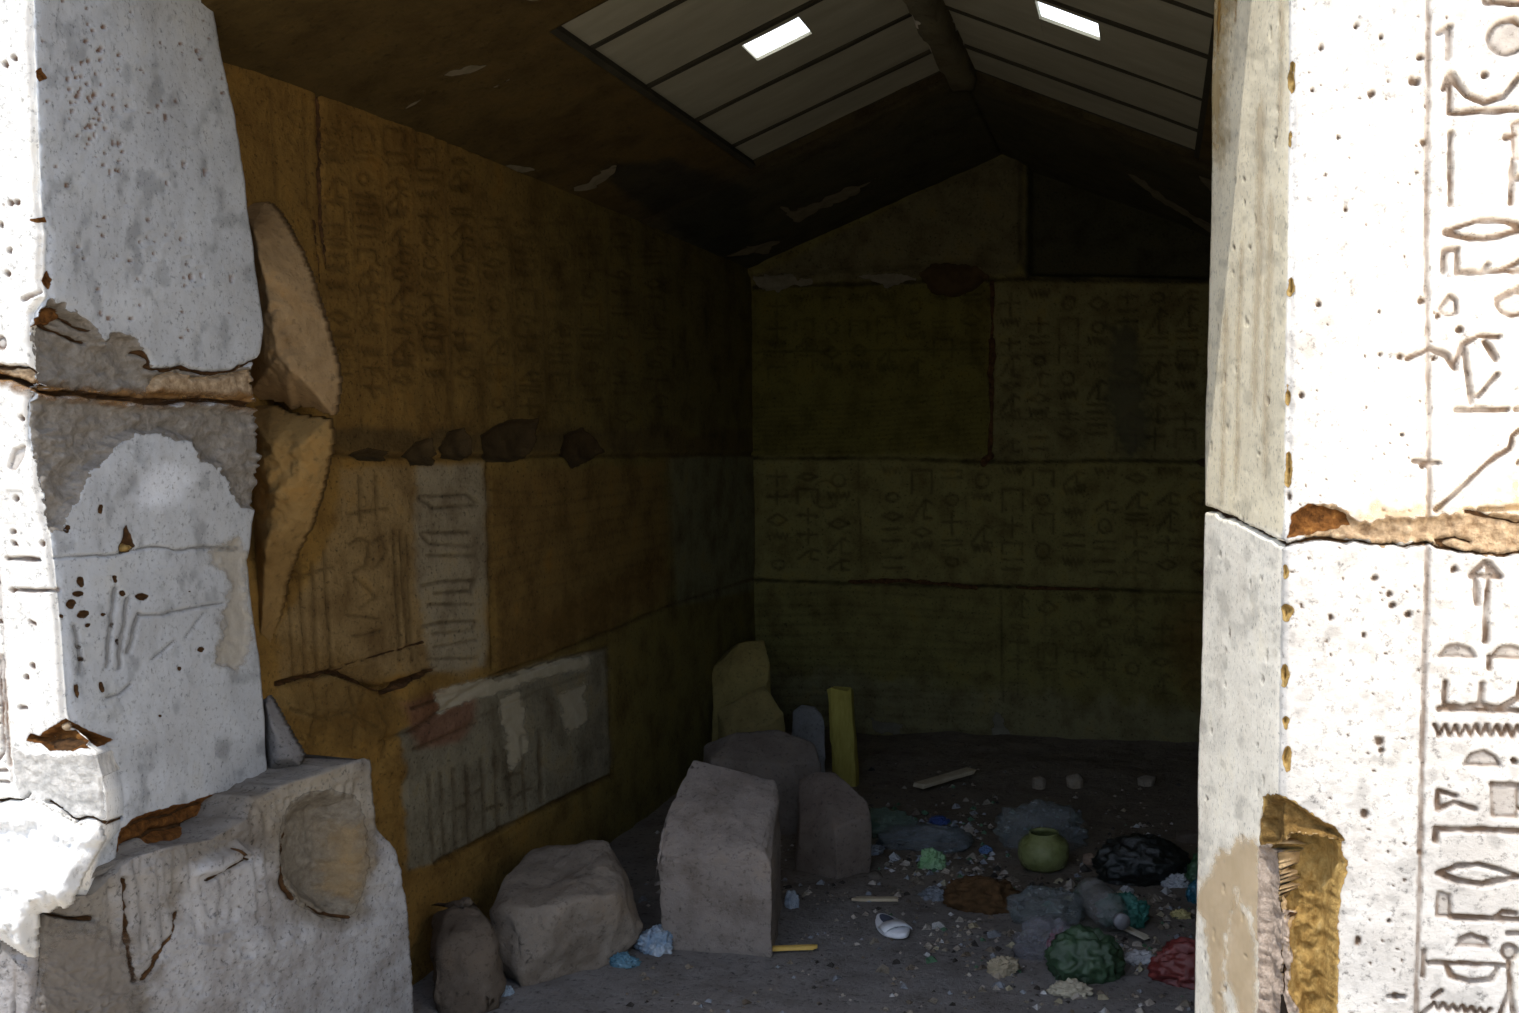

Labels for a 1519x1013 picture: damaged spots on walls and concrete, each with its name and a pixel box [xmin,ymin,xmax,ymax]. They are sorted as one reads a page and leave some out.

spalling [1287,61,1295,94]
crack [36,318,90,344]
crack [0,365,256,410]
spalling [0,271,262,533]
spalling [1284,452,1293,488]
crack [1211,507,1519,557]
spalling [1287,504,1519,557]
spalling [59,591,119,645]
spalling [1281,604,1294,622]
spalling [1281,664,1290,687]
spalling [1282,716,1292,772]
spalling [1257,793,1348,1013]